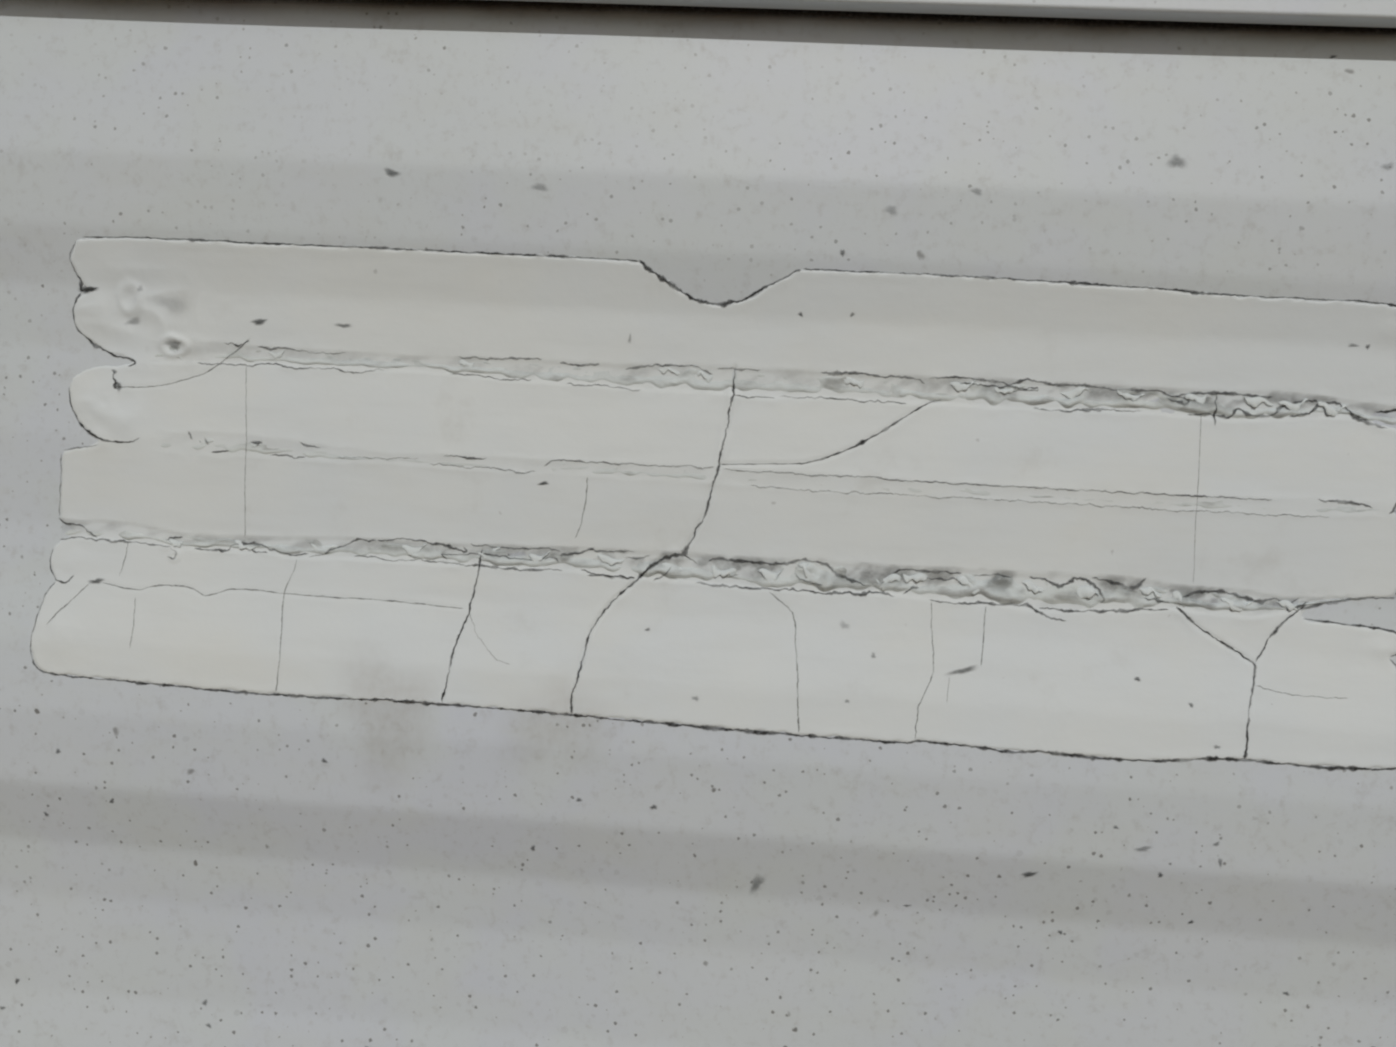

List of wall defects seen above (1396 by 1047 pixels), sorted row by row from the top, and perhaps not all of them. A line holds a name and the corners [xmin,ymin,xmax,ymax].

crack [70,236,1396,389]
crack [30,380,1396,771]